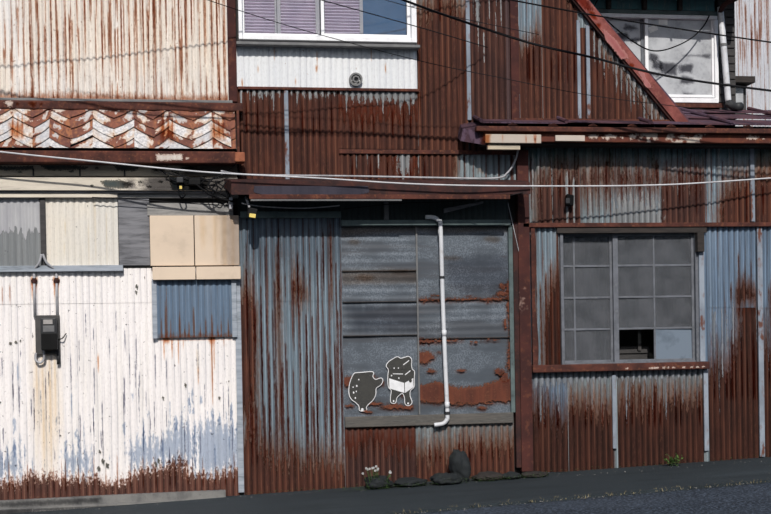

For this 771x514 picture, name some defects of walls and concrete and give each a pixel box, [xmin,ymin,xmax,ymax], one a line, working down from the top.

corrosion [237,0,507,180]
corrosion [519,0,658,120]
corrosion [537,157,705,223]
corrosion [720,166,771,222]
corrosion [0,281,514,502]
corrosion [532,281,771,472]